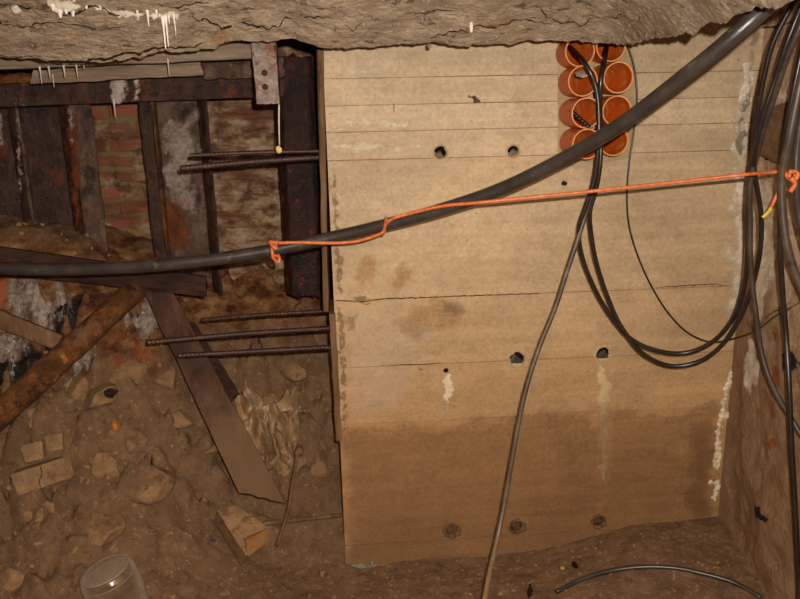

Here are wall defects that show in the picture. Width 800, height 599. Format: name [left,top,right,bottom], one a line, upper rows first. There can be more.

crack [0,3,127,31]
crack [158,1,362,31]
crack [430,6,640,38]
crack [0,42,203,63]
leakage [162,111,198,212]
leakage [417,374,454,419]
leakage [583,366,612,409]
leakage [708,371,733,502]